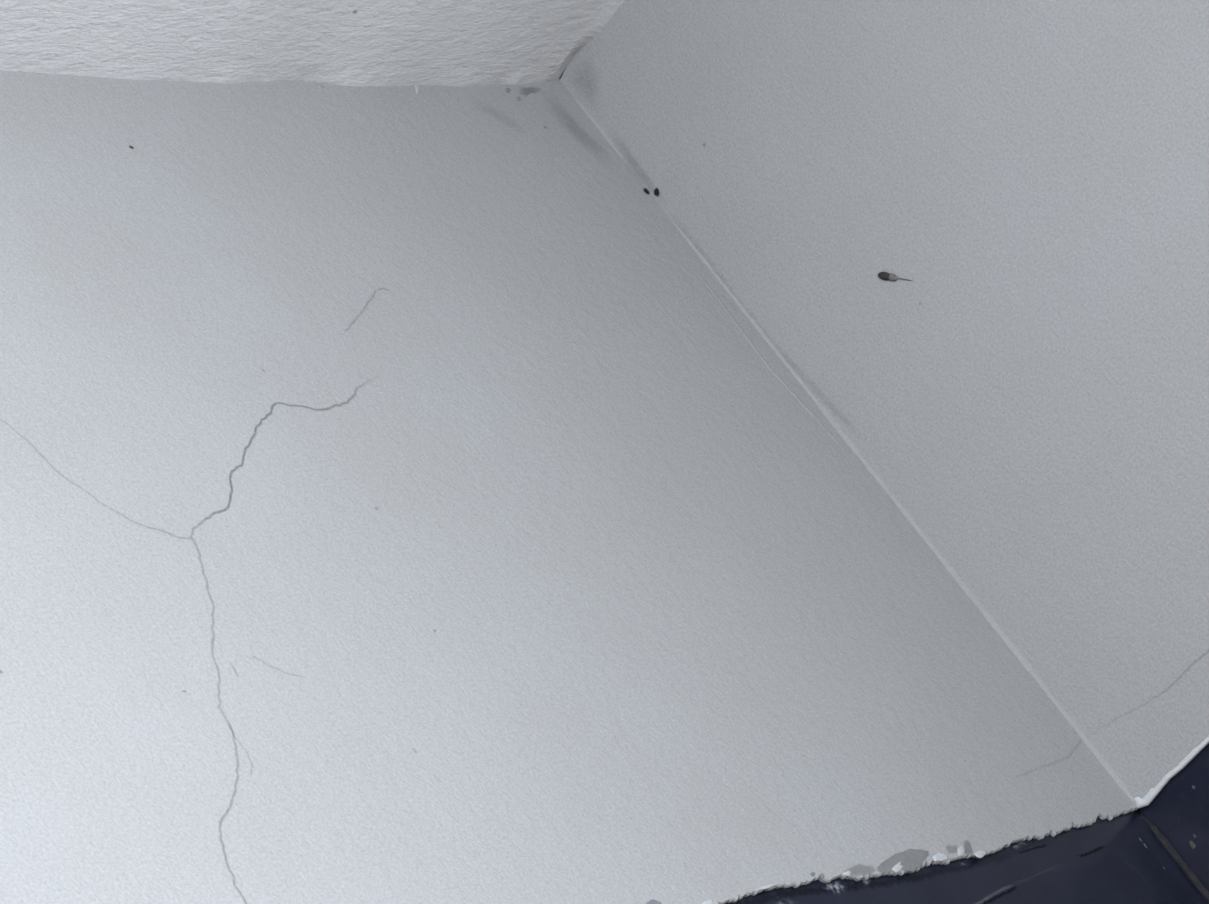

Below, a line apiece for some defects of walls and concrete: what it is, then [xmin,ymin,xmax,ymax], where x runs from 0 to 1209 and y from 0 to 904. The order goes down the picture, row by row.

peeling [878,841,987,873]